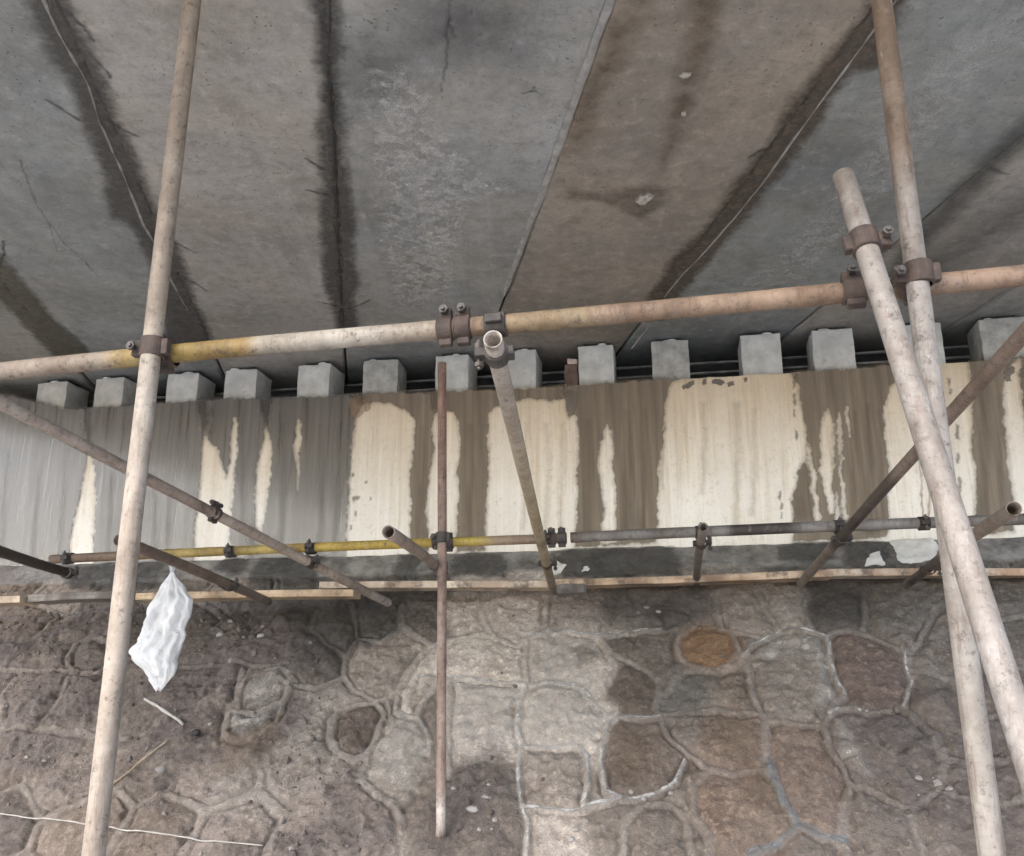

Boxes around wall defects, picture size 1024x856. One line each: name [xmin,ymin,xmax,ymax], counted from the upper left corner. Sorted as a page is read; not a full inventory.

damp [0,241,89,356]
damp [33,0,157,261]
damp [165,243,210,344]
damp [305,0,371,329]
spalling [609,191,654,212]
damp [649,3,878,301]
damp [0,393,134,590]
damp [136,389,505,587]
damp [513,379,679,578]
damp [779,364,895,563]
damp [969,357,1024,515]
damp [990,525,1014,534]